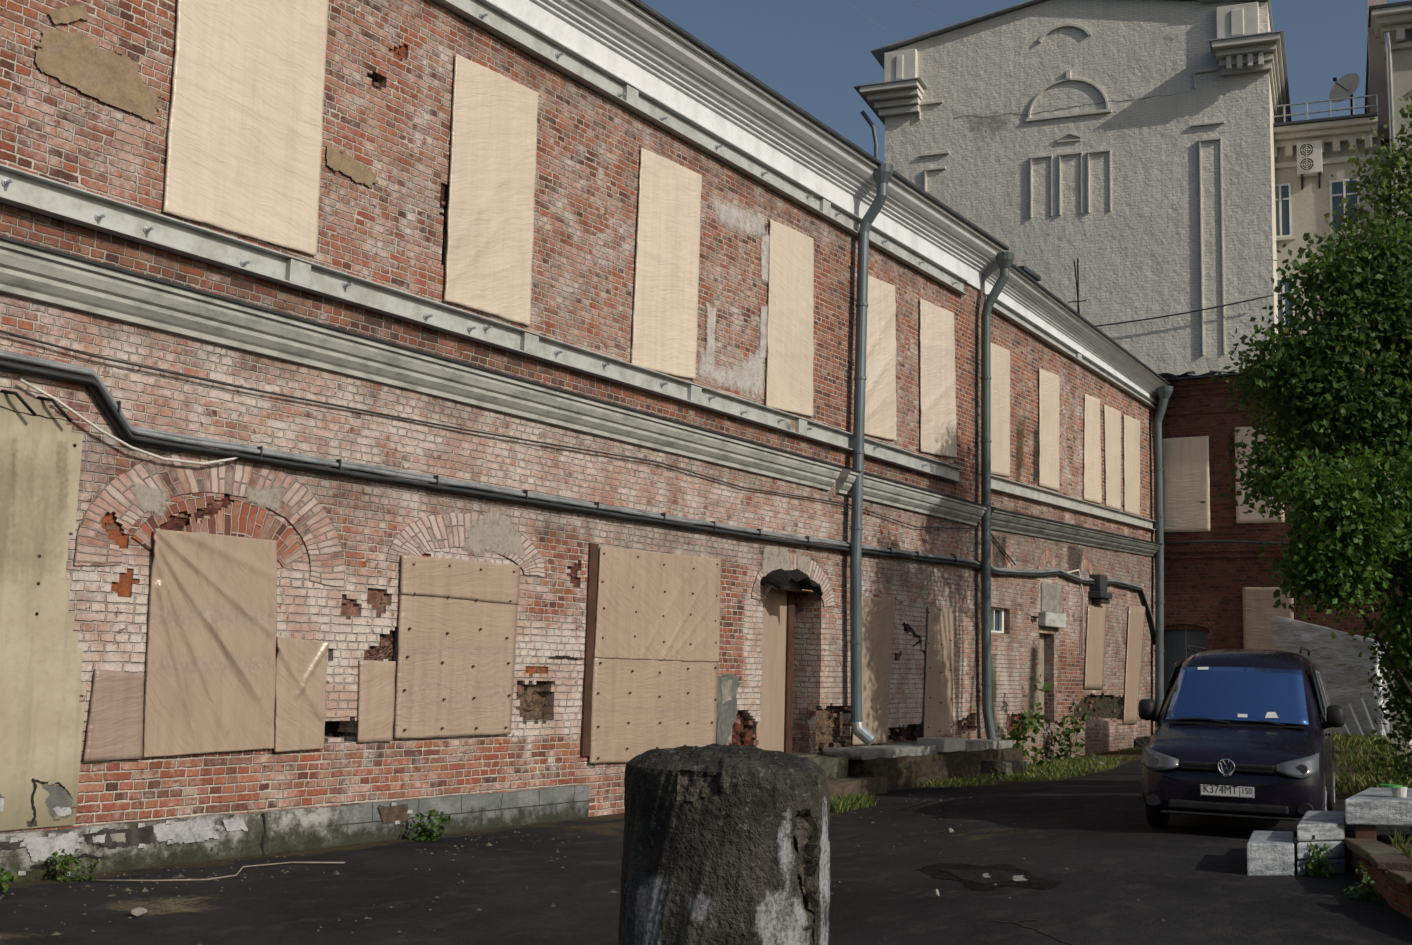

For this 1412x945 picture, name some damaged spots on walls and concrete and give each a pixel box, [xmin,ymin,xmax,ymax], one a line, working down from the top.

leakage [715,197,769,281]
leakage [699,304,768,393]
spalling [101,511,128,549]
spalling [111,568,138,597]
spalling [341,588,389,620]
spalling [364,630,395,661]
spalling [516,666,547,720]
peeling [717,673,759,746]
spalling [807,706,848,755]
peeling [0,781,248,883]
peeling [756,803,830,945]
peeling [635,878,665,945]